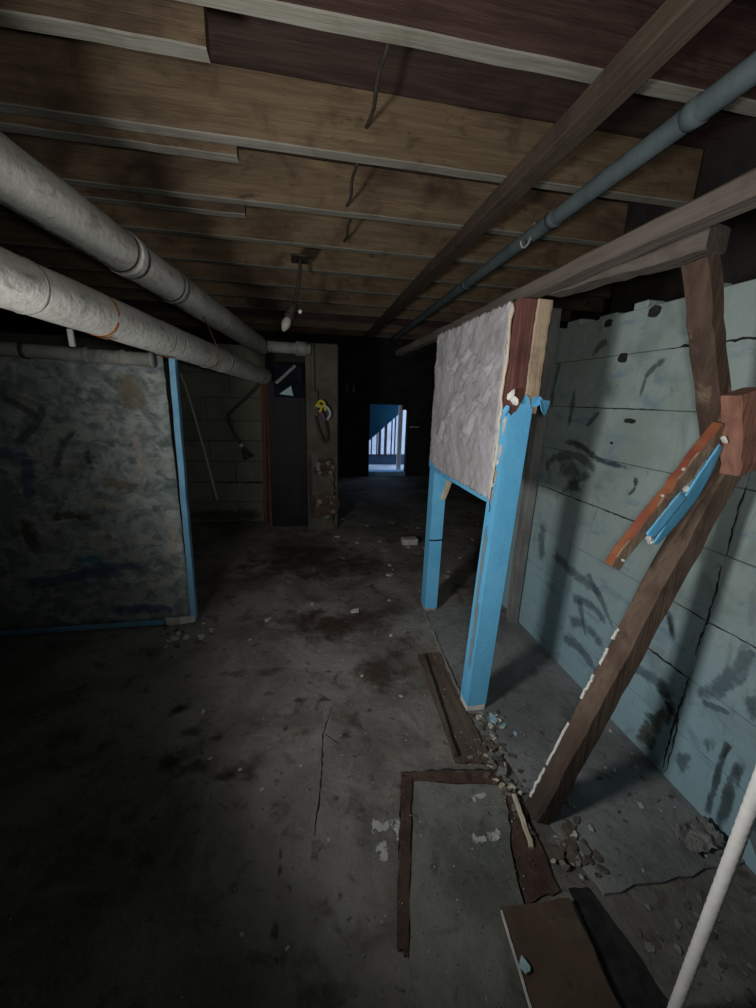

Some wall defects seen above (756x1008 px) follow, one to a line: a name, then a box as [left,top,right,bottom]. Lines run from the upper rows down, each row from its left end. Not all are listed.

crack [314,707,339,836]
crack [648,487,756,772]